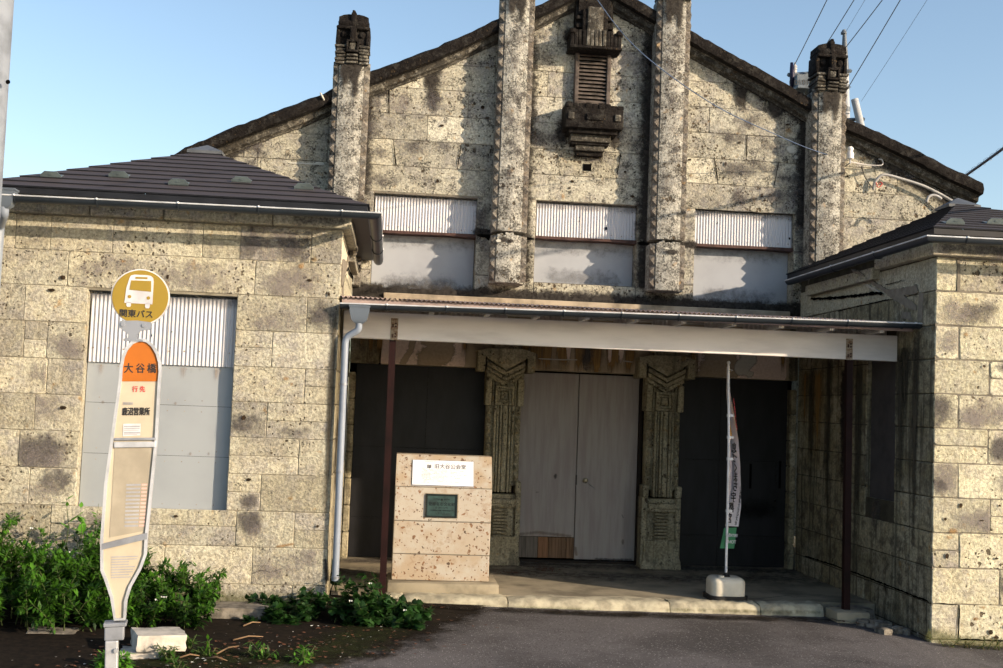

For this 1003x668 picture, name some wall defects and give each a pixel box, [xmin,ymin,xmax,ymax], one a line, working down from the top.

damp [509,0,527,21]
damp [665,0,684,45]
damp [352,32,806,317]
damp [936,302,999,351]
peeling [381,340,466,367]
peeling [697,353,787,380]
damp [802,359,862,505]
damp [896,341,918,523]
damp [935,396,1003,427]
damp [19,434,72,492]
damp [239,495,261,534]